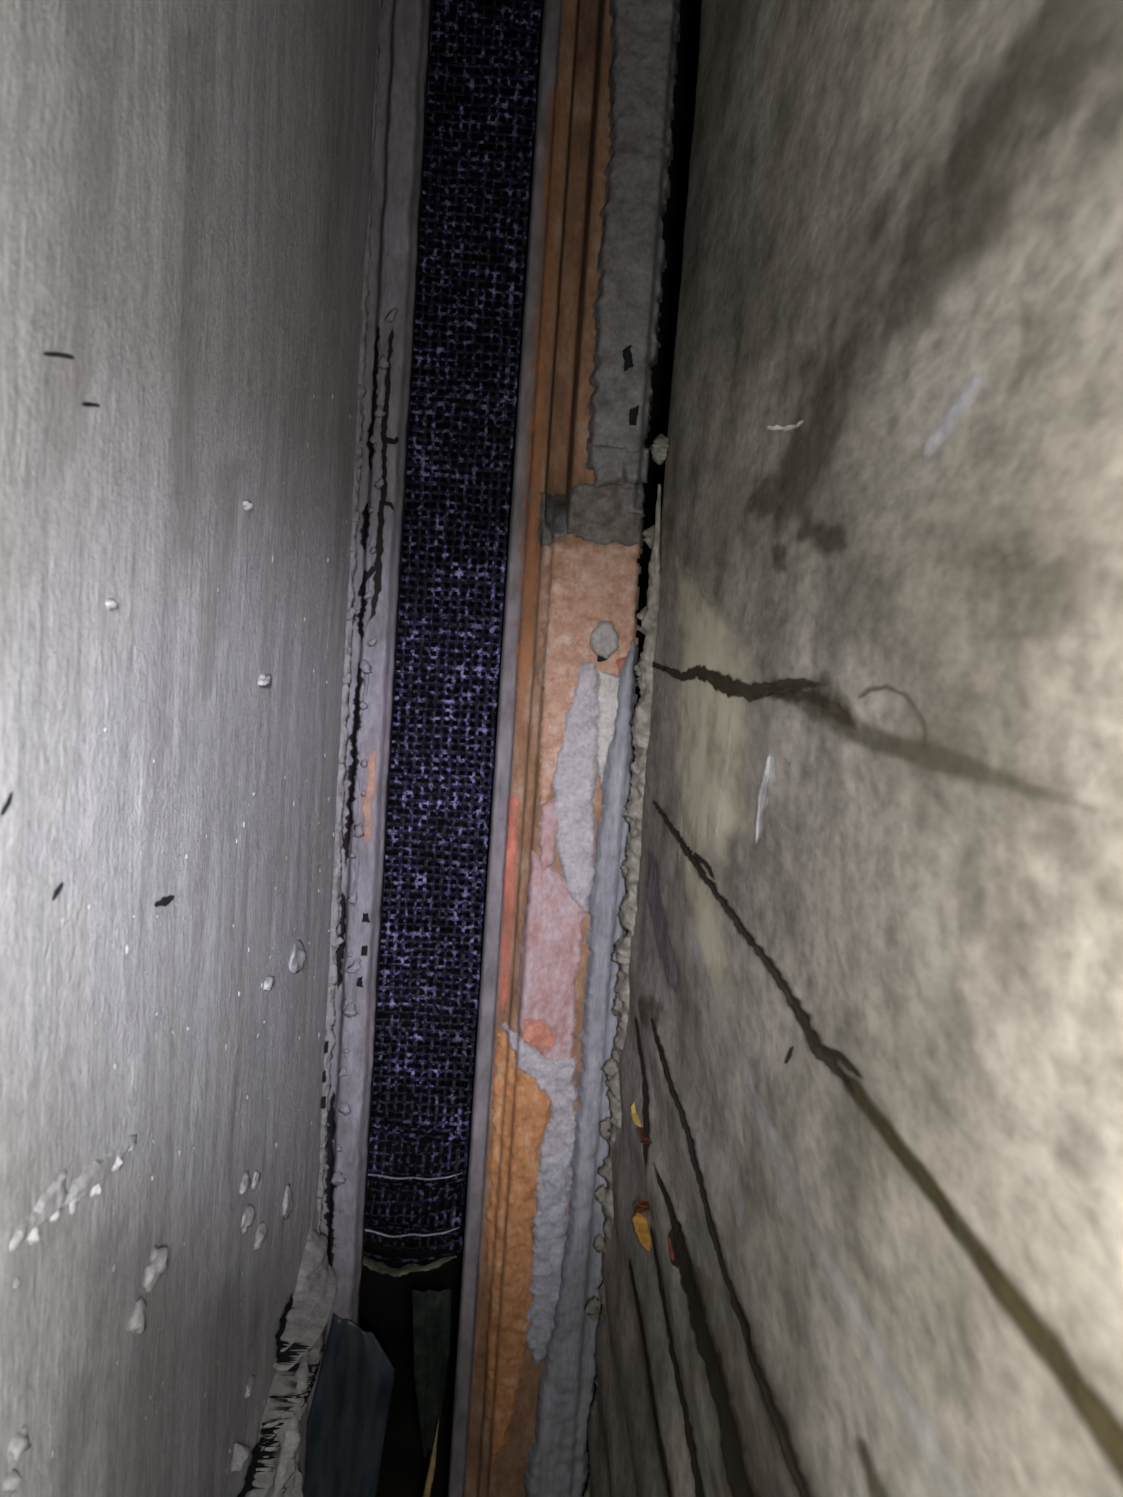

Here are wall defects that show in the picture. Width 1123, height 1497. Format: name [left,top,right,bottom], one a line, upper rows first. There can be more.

crack [336,326,399,988]
crack [651,662,992,780]
peeling [231,1443,251,1473]
crack [324,1093,337,1267]
crack [629,1018,814,1497]
crack [653,801,1123,1478]